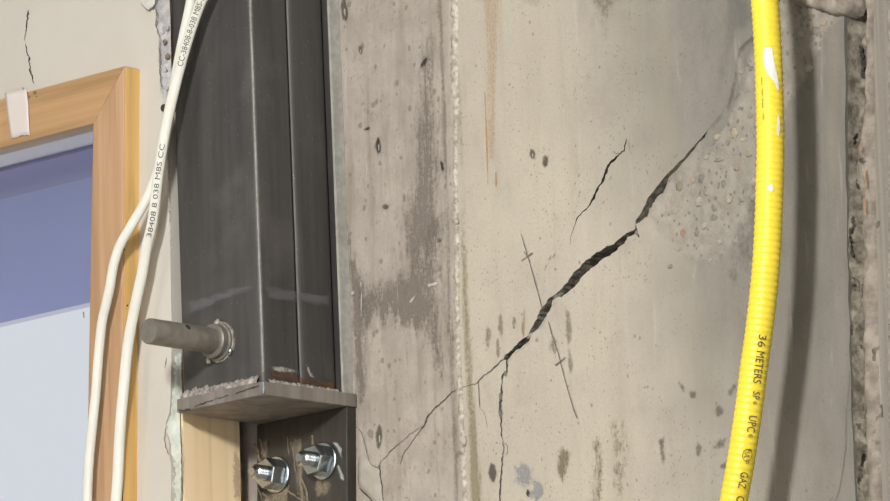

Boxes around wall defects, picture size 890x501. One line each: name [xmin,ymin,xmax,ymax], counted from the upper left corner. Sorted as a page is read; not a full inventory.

crack [22,10,34,90]
leakage [350,65,453,402]
crack [383,229,640,501]
crack [570,139,632,243]
spalling [635,36,757,279]
spalling [779,0,882,501]